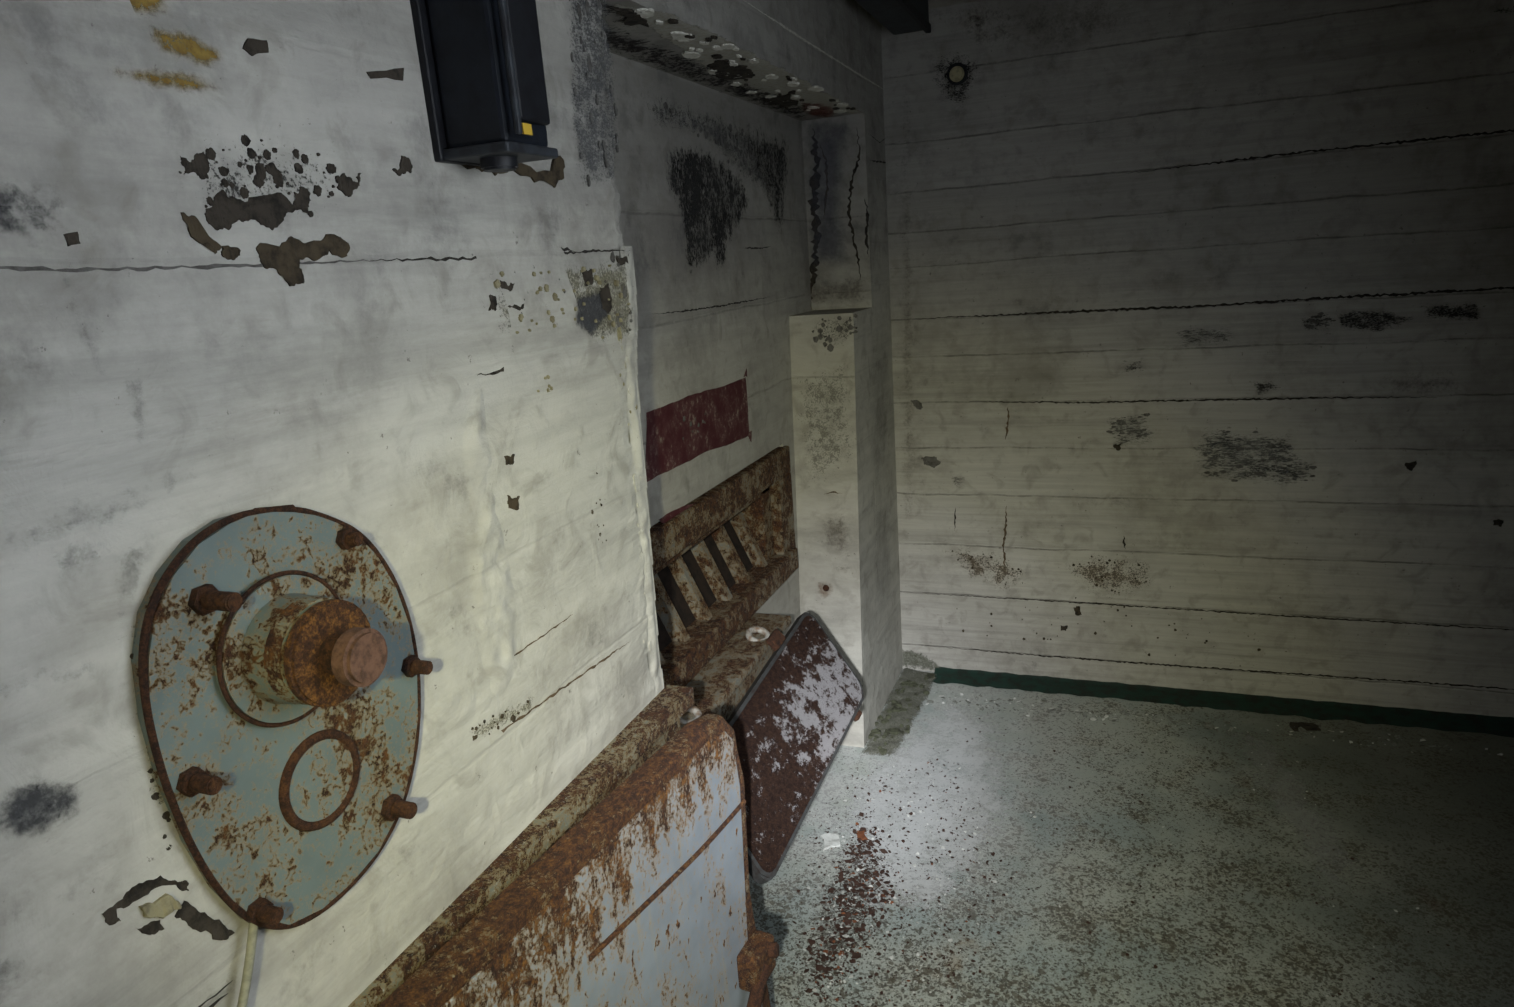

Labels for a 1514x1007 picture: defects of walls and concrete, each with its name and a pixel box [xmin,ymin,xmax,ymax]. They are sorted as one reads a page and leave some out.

damp [600,0,807,118]
peeling [179,134,361,286]
peeling [392,156,413,176]
damp [666,148,747,273]
damp [647,98,789,228]
crack [808,129,886,300]
spalling [488,246,664,694]
corrosion [138,504,421,930]
damp [0,784,76,834]
spalling [102,875,235,940]